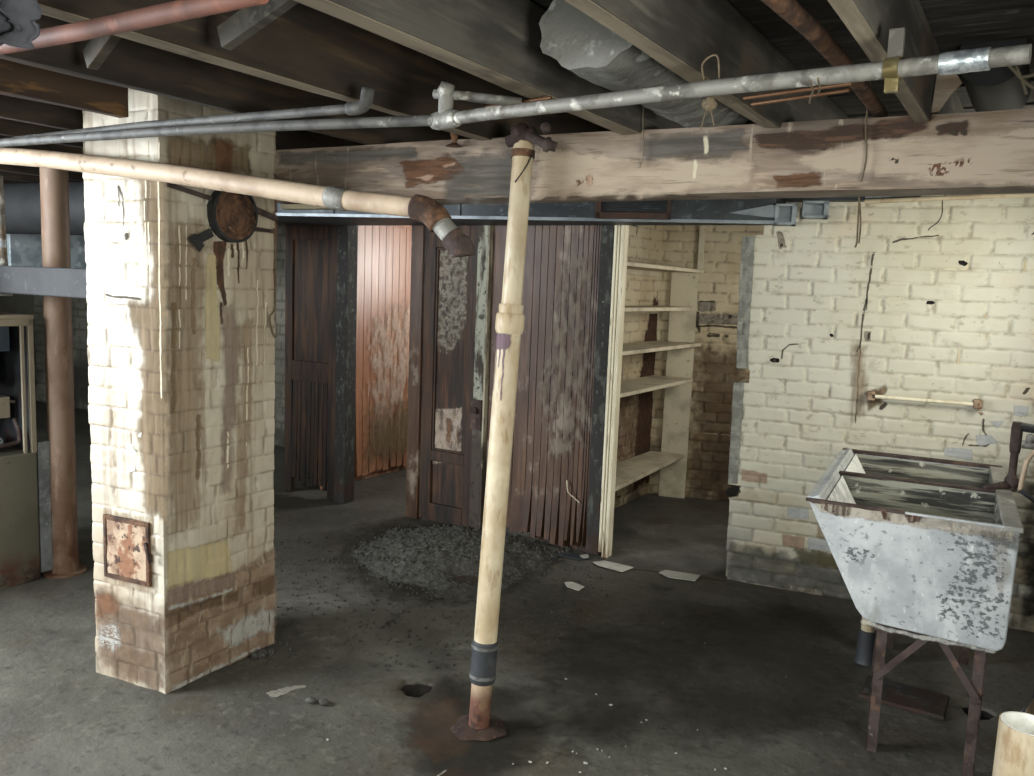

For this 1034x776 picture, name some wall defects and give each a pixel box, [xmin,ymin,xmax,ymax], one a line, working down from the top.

damp [147,137,251,175]
peeling [279,148,512,204]
peeling [531,116,1034,200]
damp [128,179,277,530]
damp [691,347,745,499]
flaking render [166,549,276,692]